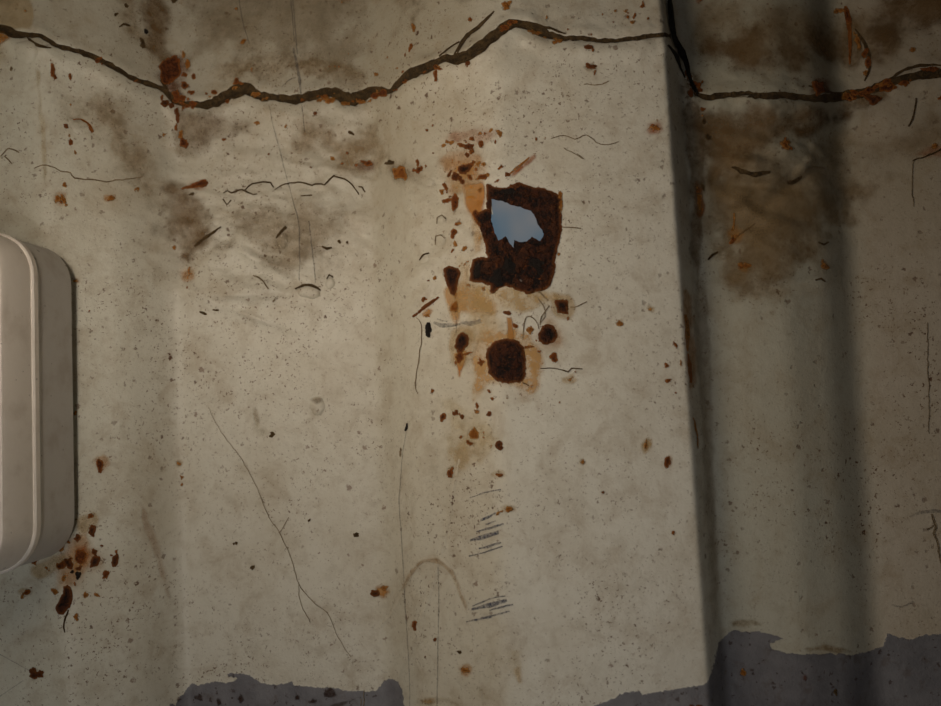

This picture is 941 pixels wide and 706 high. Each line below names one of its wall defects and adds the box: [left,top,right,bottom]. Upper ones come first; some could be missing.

rust [159,51,217,149]
rust [330,152,427,181]
crack [0,0,941,127]
rust [432,128,562,319]
crack [551,135,619,159]
water stain [683,105,850,283]
crack [912,149,941,207]
rust [554,299,569,321]
rust [440,311,558,422]
rust [460,427,503,451]
rust [31,513,119,633]